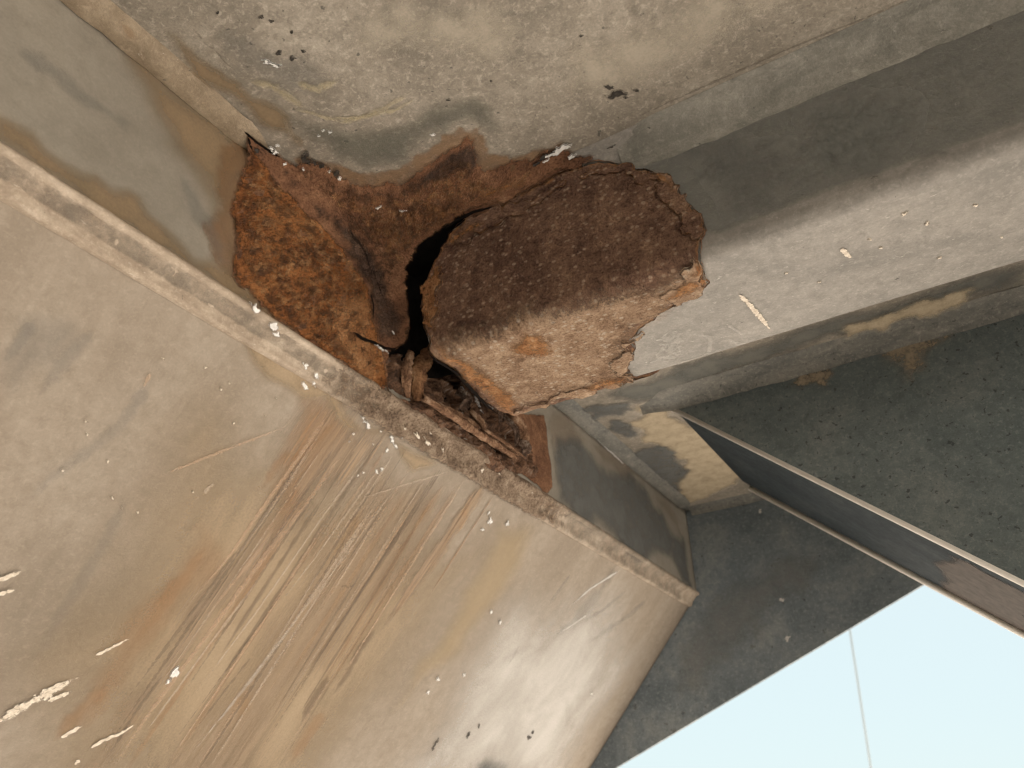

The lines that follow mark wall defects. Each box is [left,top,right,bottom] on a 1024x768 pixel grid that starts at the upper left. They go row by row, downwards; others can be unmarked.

crack [350,206,498,414]
rust [0,121,593,768]
peeling [362,416,444,452]
peeling [0,678,77,722]